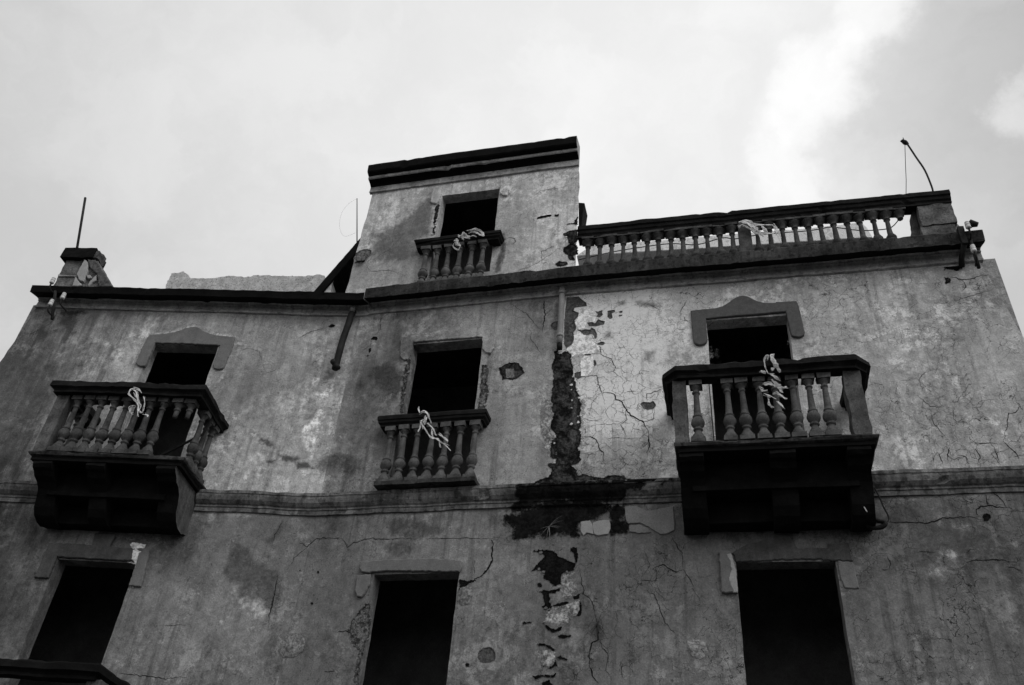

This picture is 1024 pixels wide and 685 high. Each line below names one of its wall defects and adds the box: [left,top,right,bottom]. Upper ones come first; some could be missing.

flaking render [478,362,525,409]
flaking render [535,296,631,483]
crack [581,299,687,471]
crack [839,275,1022,465]
flaking render [347,601,372,685]
crack [269,536,500,614]
flaking render [523,621,571,685]
flaking render [532,547,582,616]
flaking render [581,520,611,536]
crack [580,540,712,684]
crack [890,494,1024,553]
crack [966,549,1021,572]